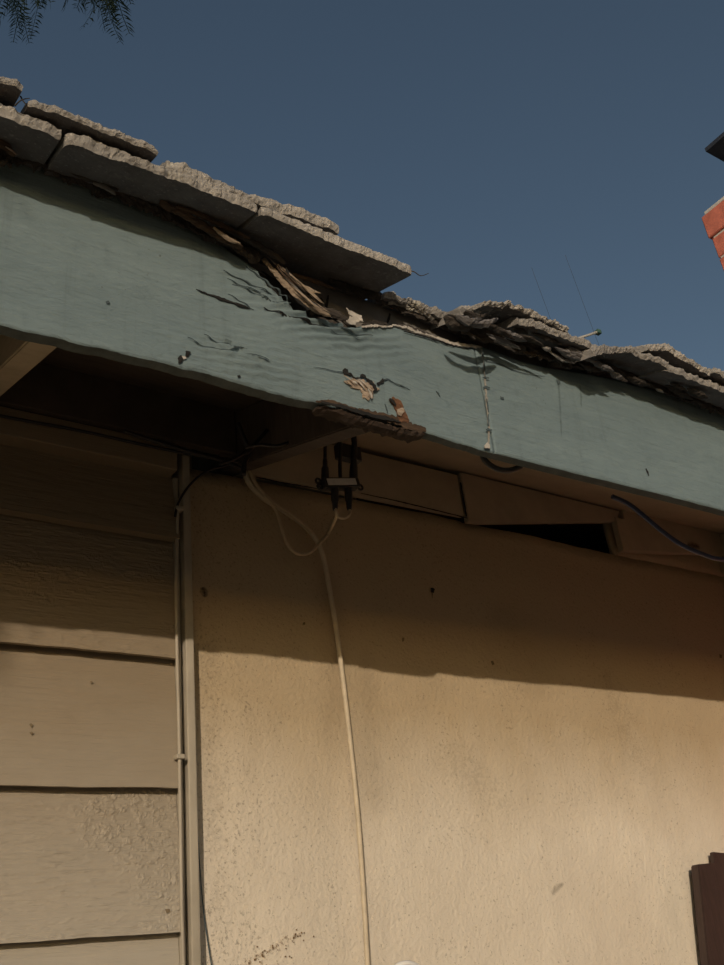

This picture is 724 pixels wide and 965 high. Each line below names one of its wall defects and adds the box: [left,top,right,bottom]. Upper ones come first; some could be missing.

spalling [258,271,364,328]
peeling [315,367,410,401]